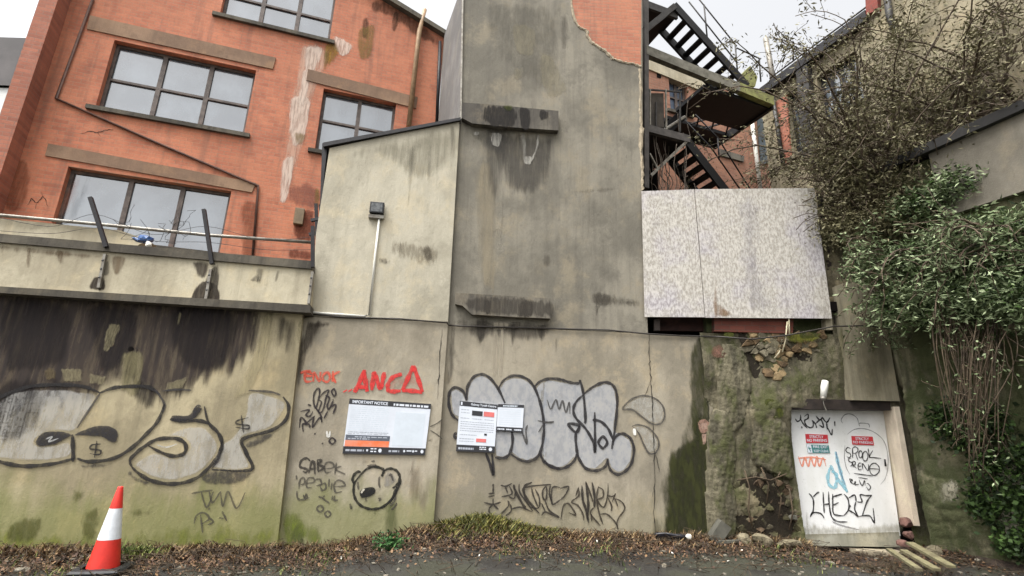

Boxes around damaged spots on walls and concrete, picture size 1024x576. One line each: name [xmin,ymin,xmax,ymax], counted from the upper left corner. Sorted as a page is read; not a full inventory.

spalling [570,0,644,190]
leakage [281,37,351,258]
leakage [491,107,550,190]
leakage [90,307,135,369]
leakage [136,383,154,405]
leakage [174,262,236,369]
leakage [239,316,325,395]
leakage [471,300,545,376]
crack [645,337,660,533]
spalling [738,318,827,381]